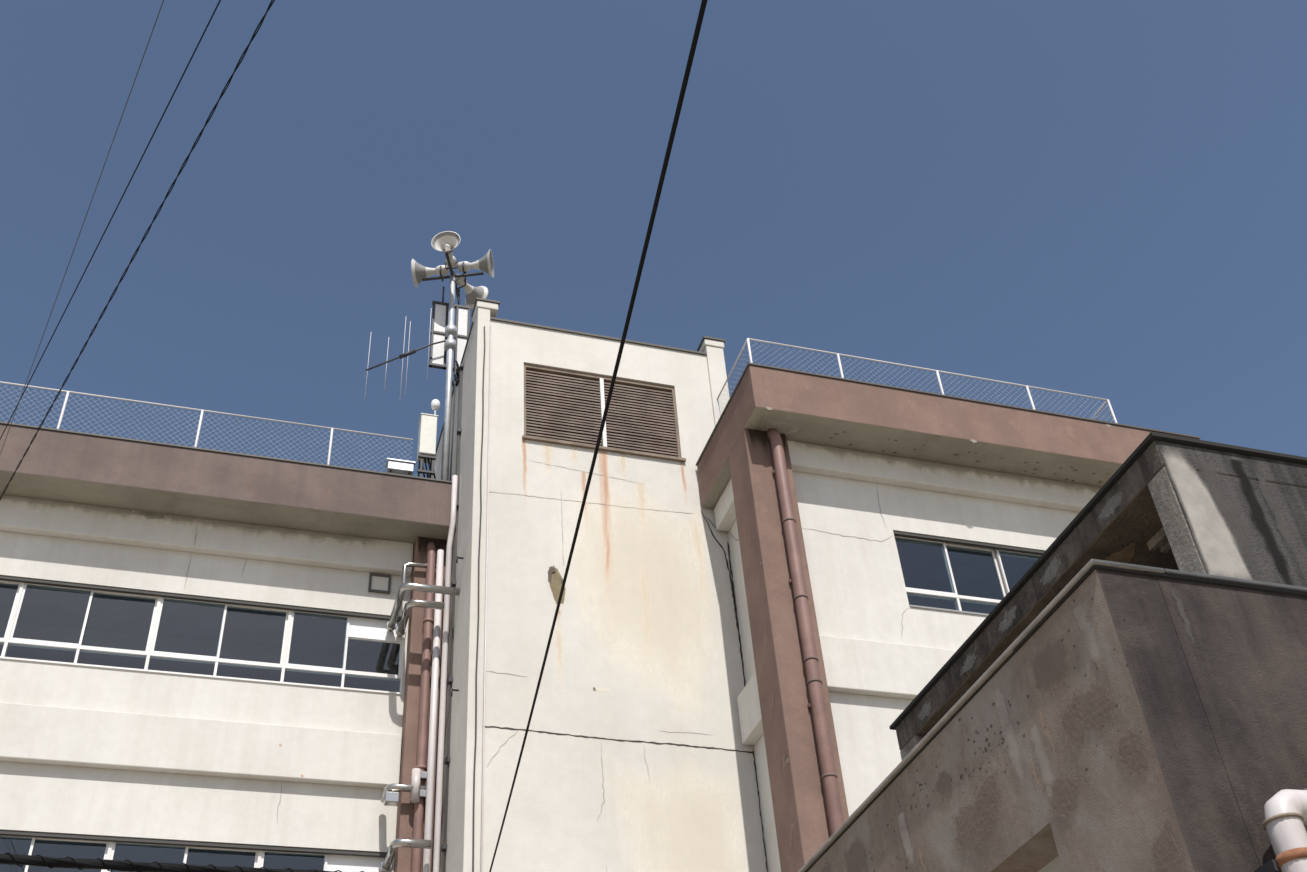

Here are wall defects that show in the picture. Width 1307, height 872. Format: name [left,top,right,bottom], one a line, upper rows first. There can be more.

rust [600,450,609,567]
water stain [1165,453,1291,585]
water stain [999,606,1016,631]